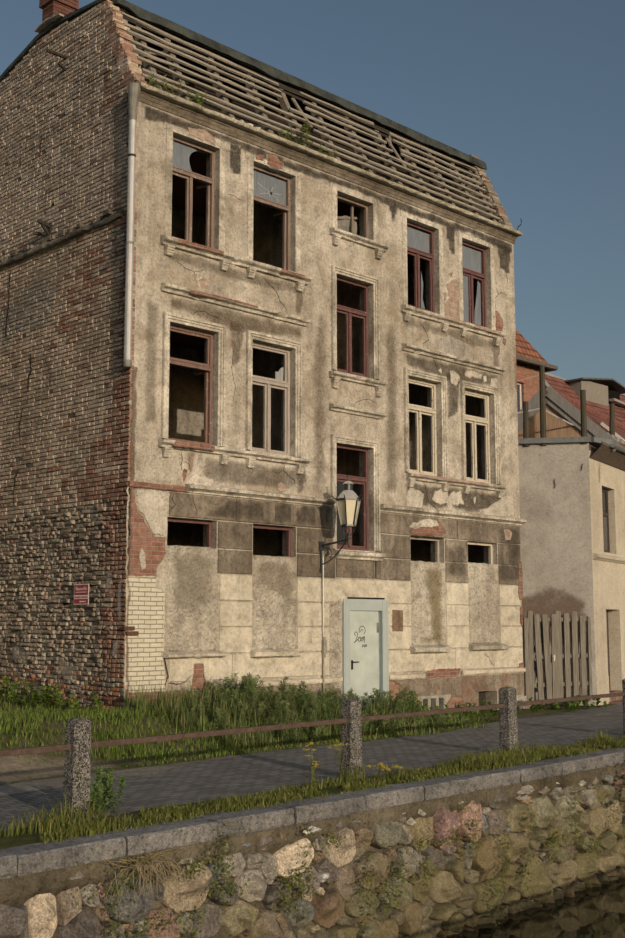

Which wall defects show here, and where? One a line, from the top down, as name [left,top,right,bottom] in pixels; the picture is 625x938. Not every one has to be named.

spalling [188,127,245,154]
spalling [256,153,284,170]
peeling [444,272,506,345]
peeling [404,487,515,517]
spalling [409,519,446,537]
flaking render [124,441,216,708]